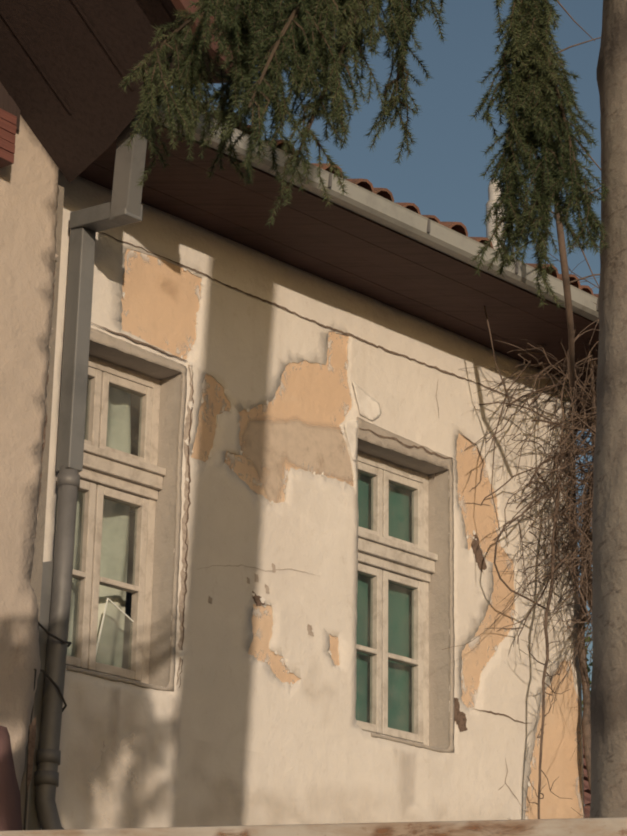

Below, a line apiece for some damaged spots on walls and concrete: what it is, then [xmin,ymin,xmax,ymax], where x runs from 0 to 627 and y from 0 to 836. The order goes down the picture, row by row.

crack [93,232,559,417]
flaking render [121,249,382,691]
crack [359,428,453,459]
crack [458,430,490,506]
flaking render [451,434,516,732]
crack [475,709,527,724]
flaking render [525,658,584,819]